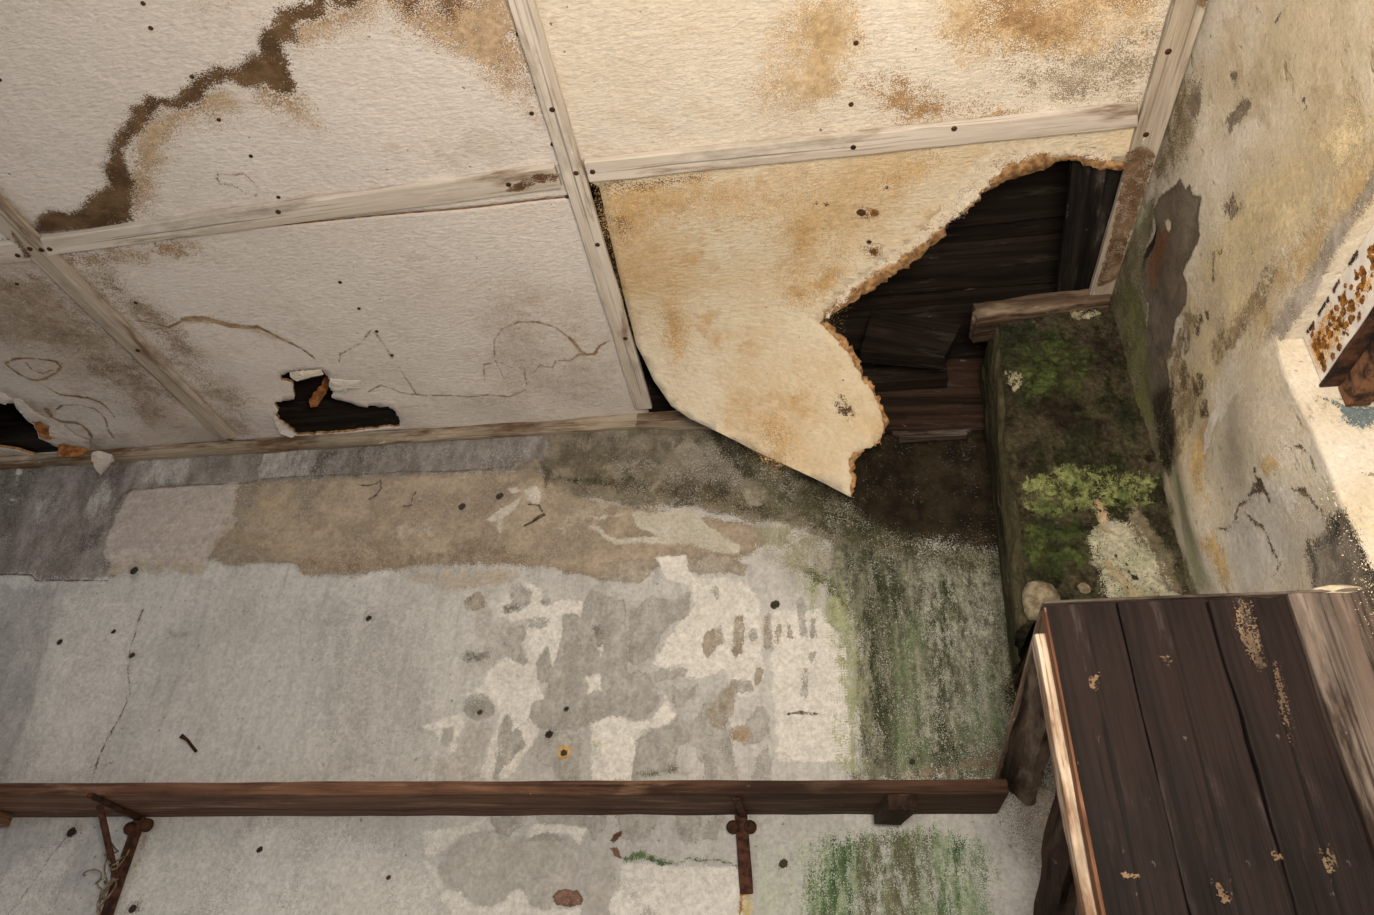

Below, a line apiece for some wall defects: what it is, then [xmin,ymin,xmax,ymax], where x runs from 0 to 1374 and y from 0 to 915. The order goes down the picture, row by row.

damp [29,0,550,234]
damp [730,0,1168,139]
peeling [0,392,115,475]
peeling [273,416,297,438]
peeling [290,370,363,393]
flaking render [1098,145,1333,593]
damp [1302,443,1374,634]
peeling [433,553,772,781]
peeling [701,597,817,699]